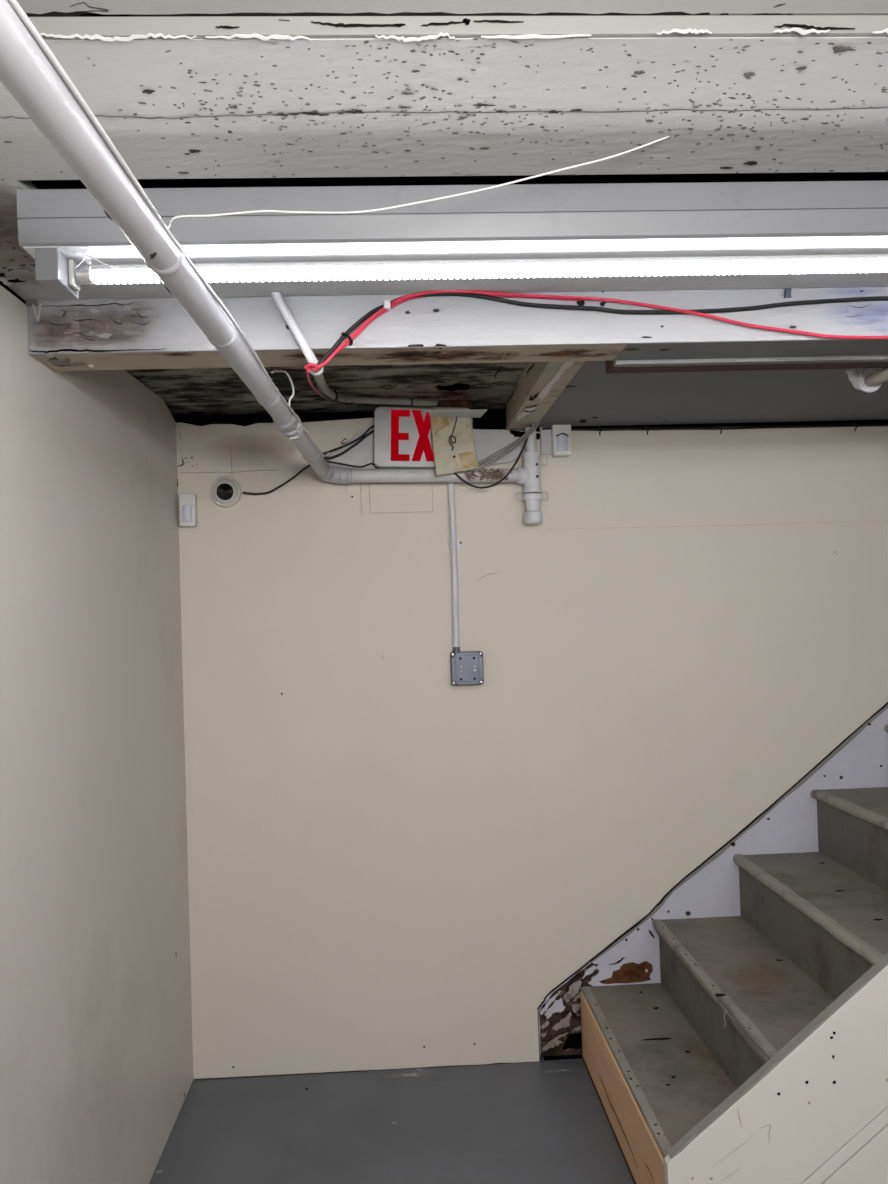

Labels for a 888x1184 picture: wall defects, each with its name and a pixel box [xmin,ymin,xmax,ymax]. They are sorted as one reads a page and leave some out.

peeling [539,957,653,1057]